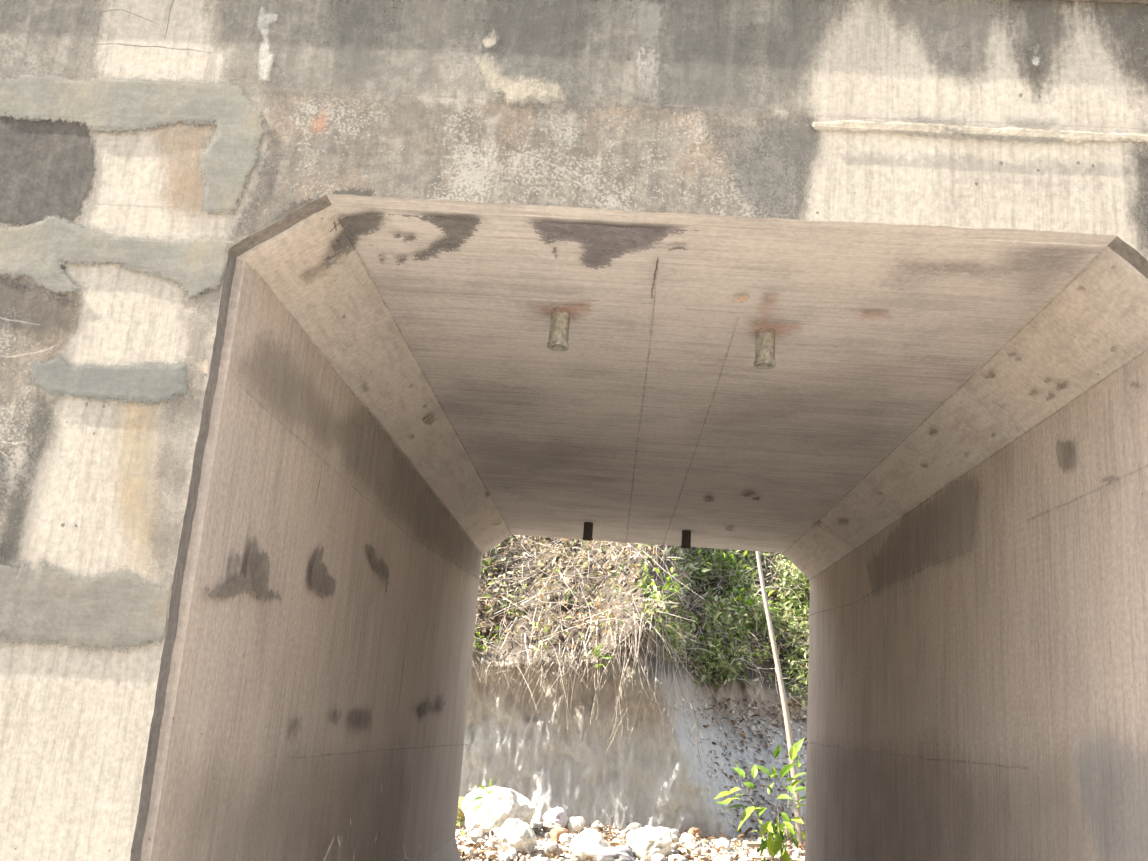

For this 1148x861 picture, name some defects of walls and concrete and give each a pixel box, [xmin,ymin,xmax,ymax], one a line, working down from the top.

water stain [889,0,1148,94]
water stain [213,0,851,256]
water stain [323,213,385,269]
water stain [1134,142,1148,246]
water stain [205,538,281,603]
water stain [310,547,336,598]